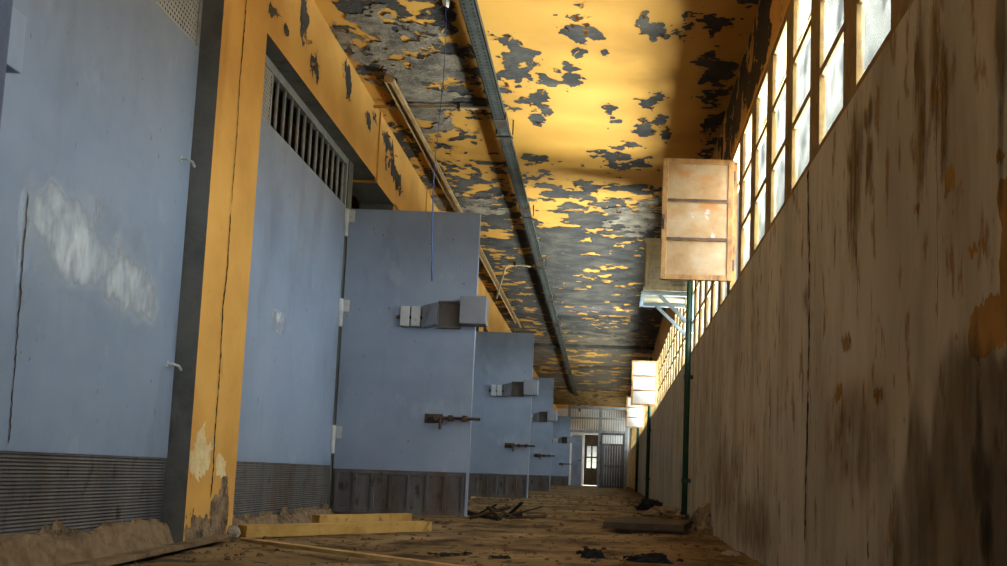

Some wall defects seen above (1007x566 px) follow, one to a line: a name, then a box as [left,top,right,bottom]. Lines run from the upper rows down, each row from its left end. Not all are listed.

peeling [268,0,320,85]
peeling [634,0,783,160]
crack [210,0,247,497]
peeling [329,0,672,393]
peeling [956,177,1007,359]
flaking render [184,422,229,541]
damp [893,350,1007,566]